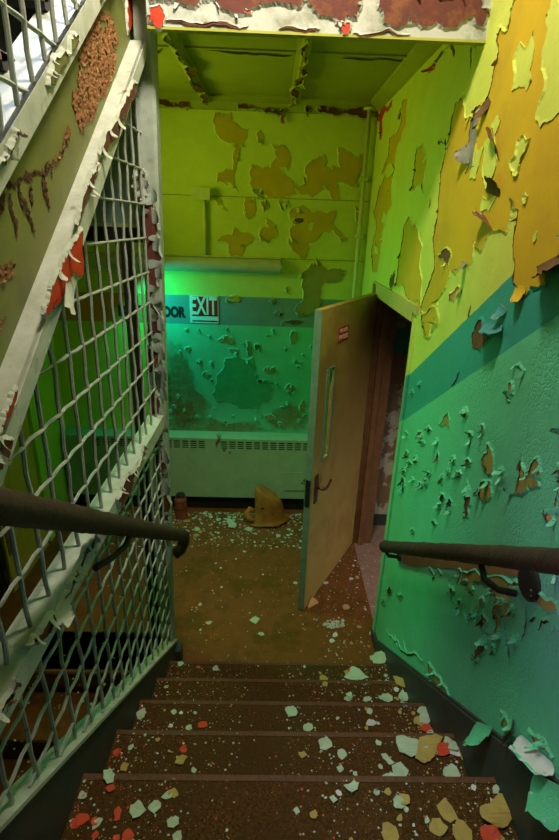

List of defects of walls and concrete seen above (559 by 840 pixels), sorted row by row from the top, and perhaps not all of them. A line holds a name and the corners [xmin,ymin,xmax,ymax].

peeling [40,226,84,320]
peeling [212,111,364,352]
peeling [375,0,559,353]
peeling [115,168,186,526]
peeling [397,405,559,528]
peeling [25,534,101,649]
peeling [402,555,559,664]
peeling [342,666,408,730]
peeling [103,744,134,792]
peeling [114,788,179,821]
peeling [167,816,182,840]
peeling [374,706,559,840]